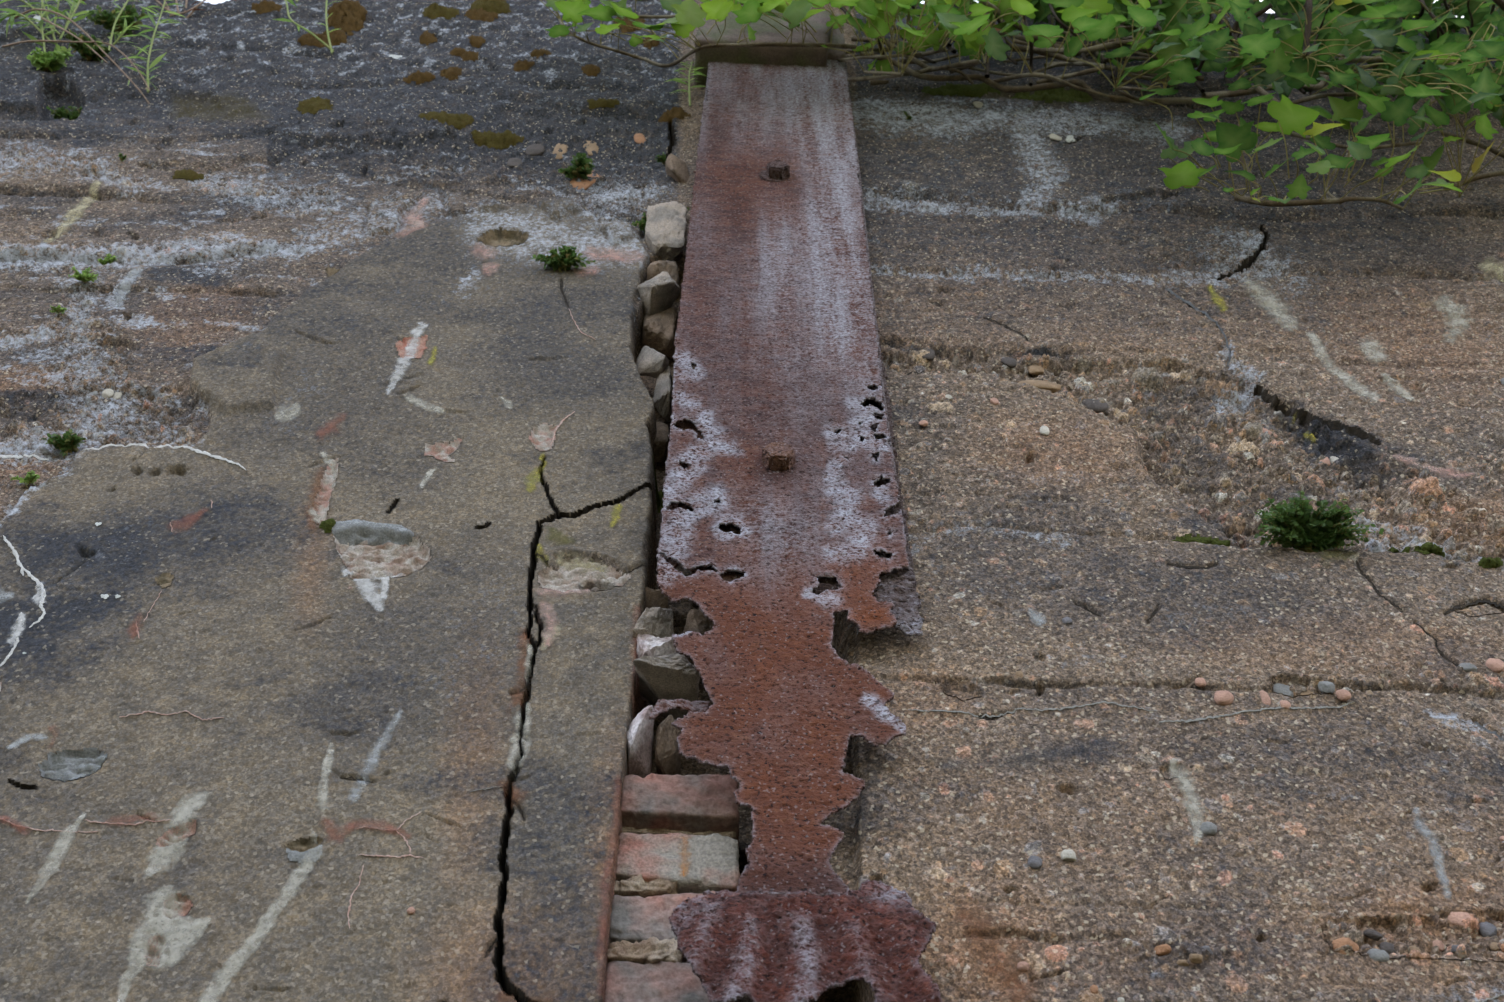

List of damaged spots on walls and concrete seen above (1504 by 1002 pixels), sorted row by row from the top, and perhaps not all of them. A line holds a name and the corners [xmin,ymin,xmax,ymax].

crack [1166,224,1381,445]
crack [386,498,400,514]
crack [471,411,656,1002]
corrosion [633,639,710,720]